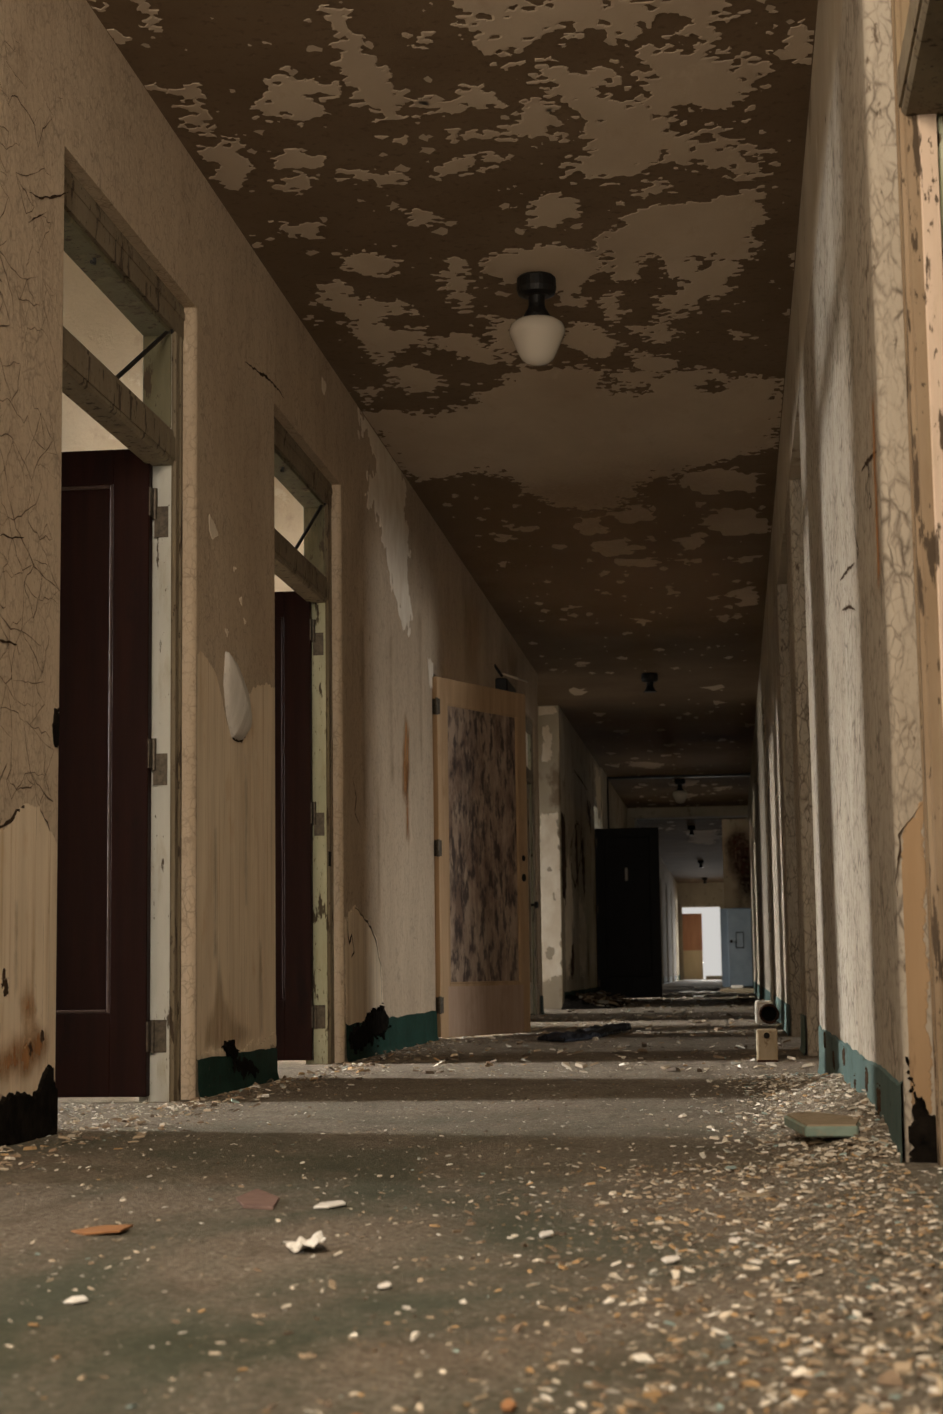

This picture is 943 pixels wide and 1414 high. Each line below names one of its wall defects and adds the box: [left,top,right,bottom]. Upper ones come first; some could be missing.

peeling [107,0,163,48]
crack [0,32,68,830]
peeling [144,0,814,696]
peeling [0,803,57,1097]
peeling [196,651,276,1068]
peeling [538,684,755,982]